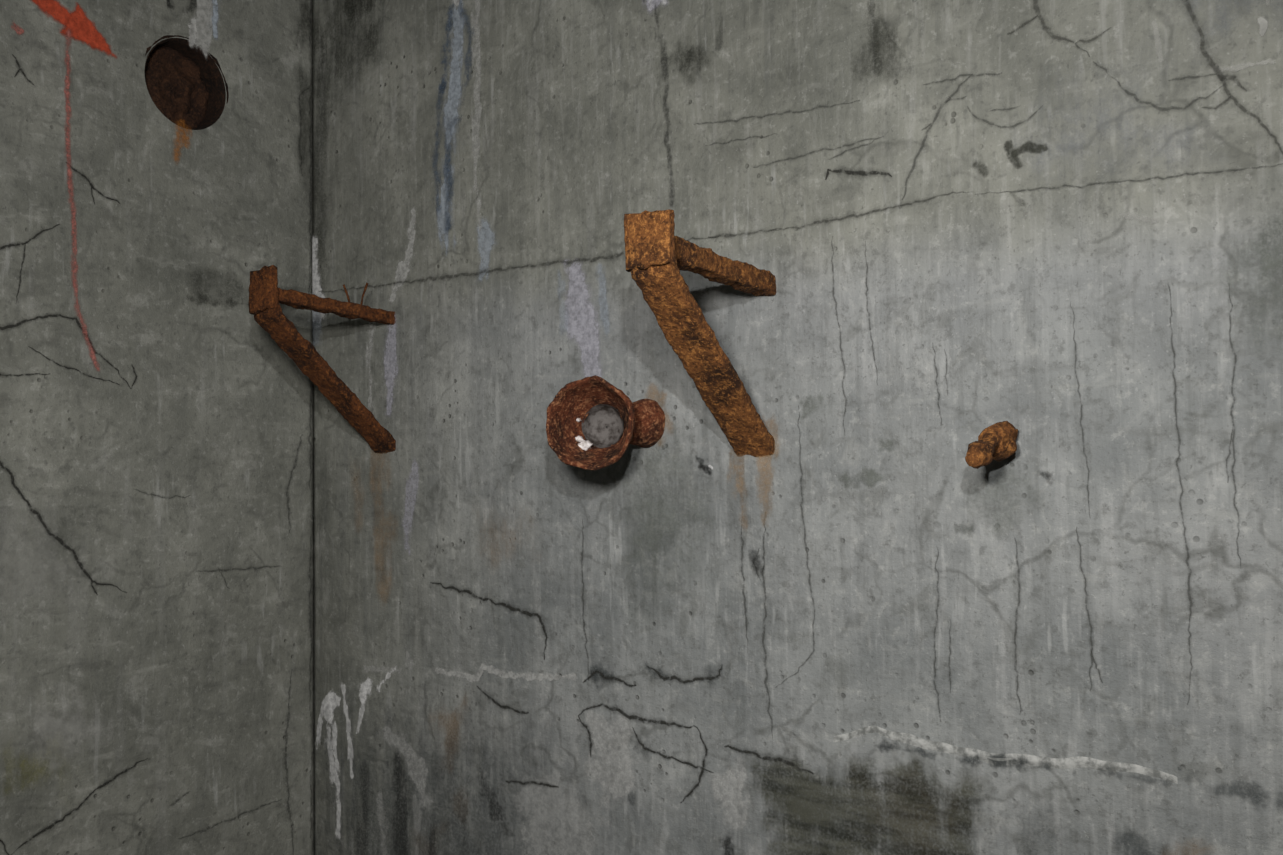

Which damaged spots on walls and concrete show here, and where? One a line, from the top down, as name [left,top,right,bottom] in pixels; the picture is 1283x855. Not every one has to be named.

crack [299,94,623,292]
crack [687,0,1283,432]
crack [0,224,137,389]
crack [0,461,123,595]
crack [0,760,144,855]
leakage [316,692,341,838]
leakage [359,668,396,703]
crack [430,582,547,660]
crack [477,686,529,713]
crack [578,521,814,803]
crack [741,405,814,719]
leakage [753,748,976,855]